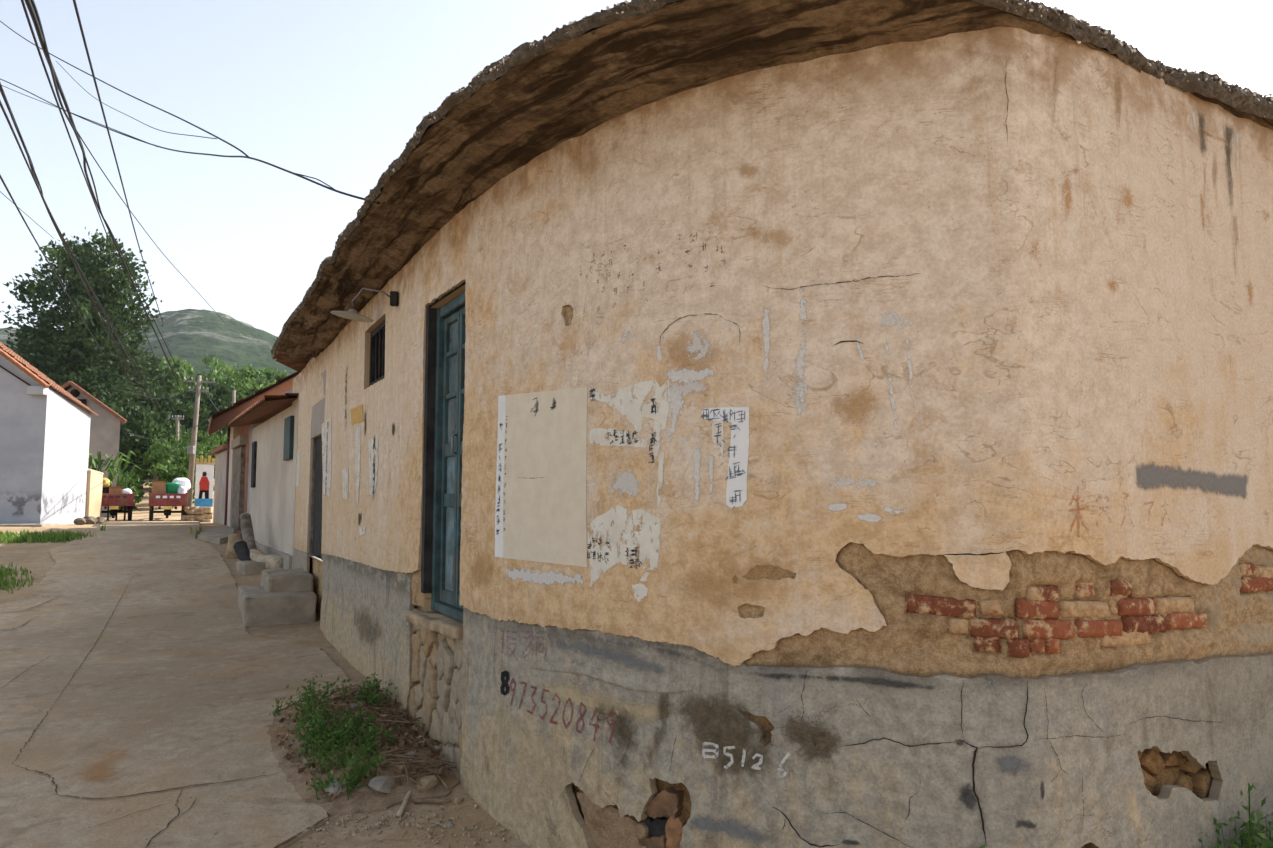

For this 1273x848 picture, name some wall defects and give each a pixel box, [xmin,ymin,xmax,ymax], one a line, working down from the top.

water stain [1192,112,1206,149]
water stain [1226,128,1241,195]
crack [1,580,131,702]
spalling [744,542,1273,679]
crack [841,680,1222,846]
crack [16,765,277,847]
crack [274,816,330,848]
crack [773,807,839,847]
crack [825,782,921,848]